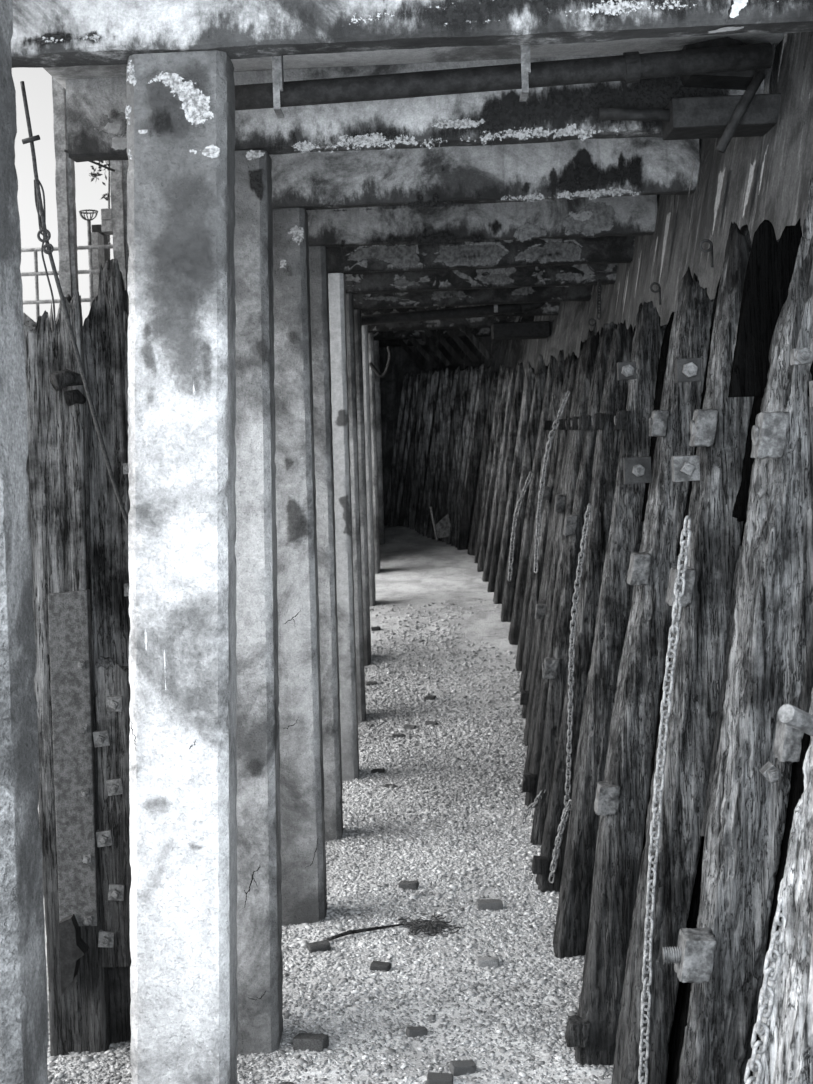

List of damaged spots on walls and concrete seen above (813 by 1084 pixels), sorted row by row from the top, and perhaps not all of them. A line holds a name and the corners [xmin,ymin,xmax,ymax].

leakage [381,0,813,34]
leakage [149,73,192,133]
leakage [183,65,206,96]
leakage [352,127,409,146]
leakage [432,76,729,145]
leakage [549,149,643,198]
peeling [433,187,641,296]
peeling [347,245,474,315]